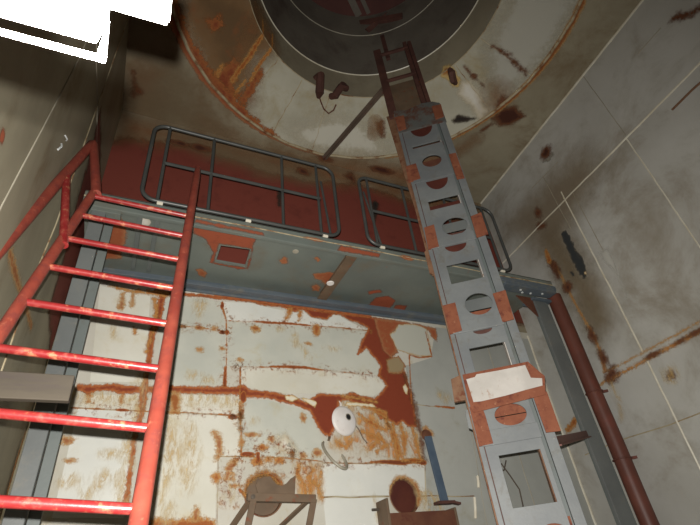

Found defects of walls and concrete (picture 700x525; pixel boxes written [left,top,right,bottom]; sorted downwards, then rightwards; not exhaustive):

corrosion [671,7,700,21]
corrosion [169,0,333,162]
corrosion [451,0,586,140]
water stain [512,163,601,323]
corrosion [183,292,372,322]
corrosion [544,249,700,386]
corrosion [110,286,171,422]
corrosion [335,394,434,460]
corrosion [118,431,139,502]
corrosion [210,430,324,498]
corrosion [149,505,215,525]